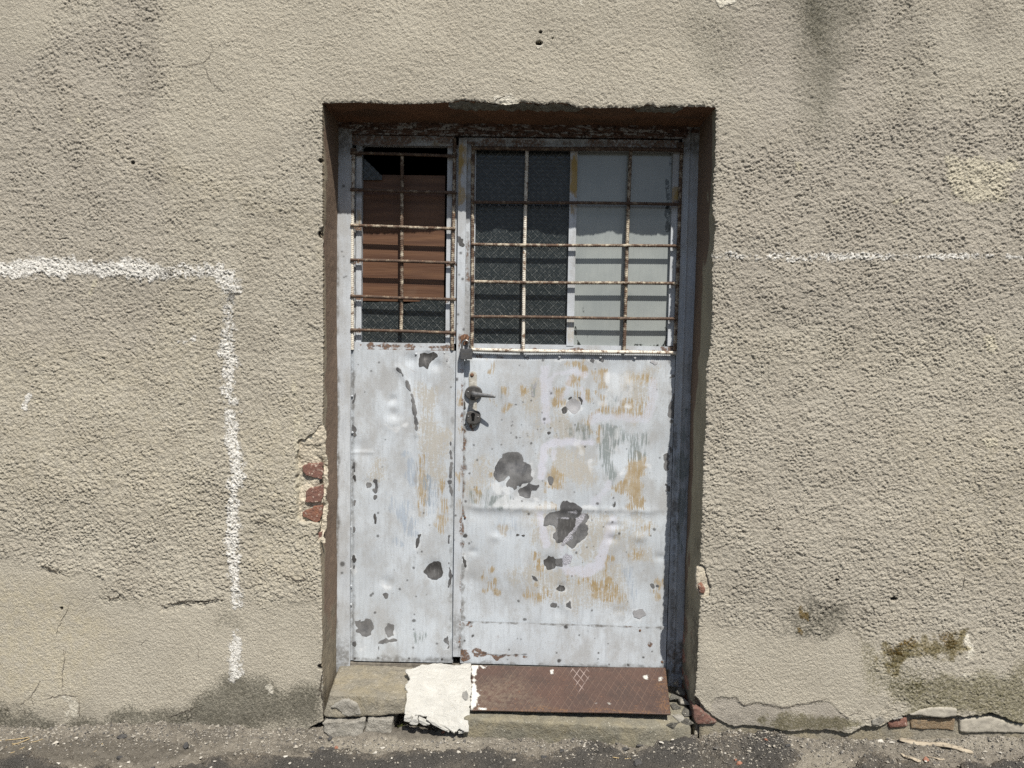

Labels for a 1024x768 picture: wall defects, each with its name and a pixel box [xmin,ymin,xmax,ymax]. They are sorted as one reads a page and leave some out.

spalling [298,424,329,544]
peeling [871,706,957,726]